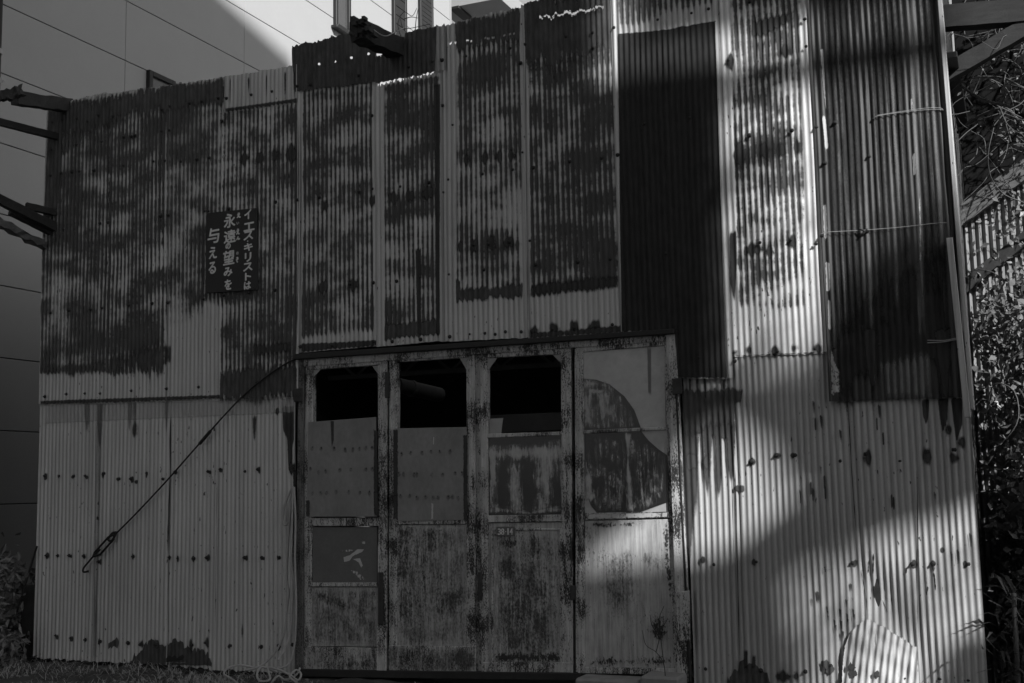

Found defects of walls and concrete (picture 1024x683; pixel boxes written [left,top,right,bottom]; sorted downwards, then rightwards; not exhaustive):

rust [40,26,440,570]
rust [455,0,965,563]
rust [393,430,468,520]
rust [98,637,212,666]
rust [727,651,799,683]
rust [820,660,835,675]